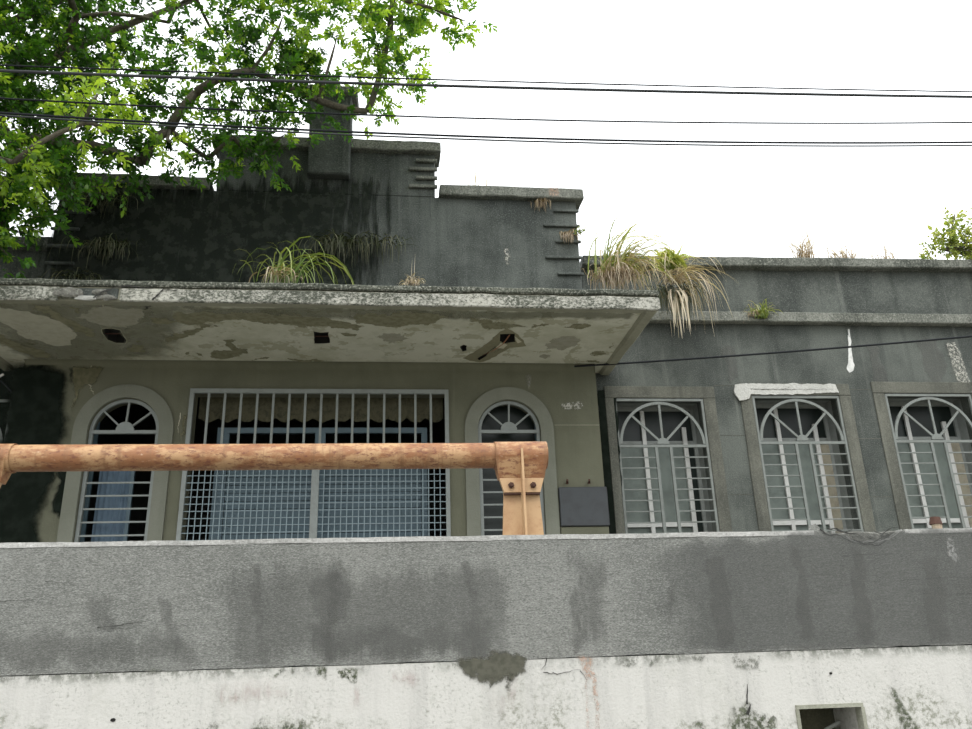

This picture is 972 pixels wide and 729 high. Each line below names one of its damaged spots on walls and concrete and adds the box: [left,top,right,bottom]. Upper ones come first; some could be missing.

peeling [0,285,446,359]
spalling [460,317,549,362]
peeling [539,324,591,359]
damp [847,329,855,373]
damp [0,303,632,445]
damp [0,472,66,543]
damp [731,703,776,729]
damp [892,689,918,729]